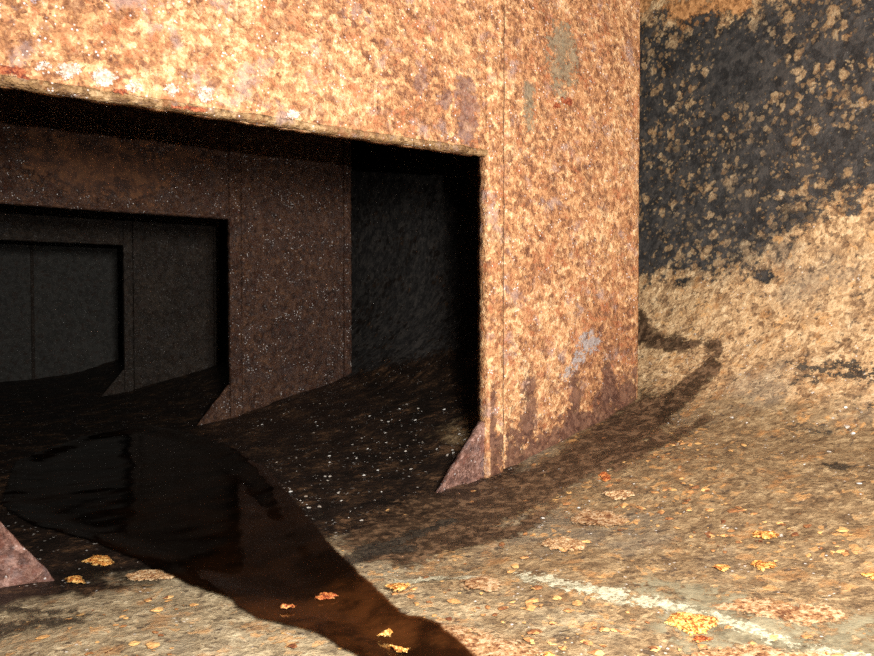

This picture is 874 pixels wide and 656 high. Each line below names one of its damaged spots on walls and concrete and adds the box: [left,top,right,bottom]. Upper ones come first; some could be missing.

water stain [335,309,724,568]
efflorescence [392,576,483,584]
efflorescence [513,571,874,656]